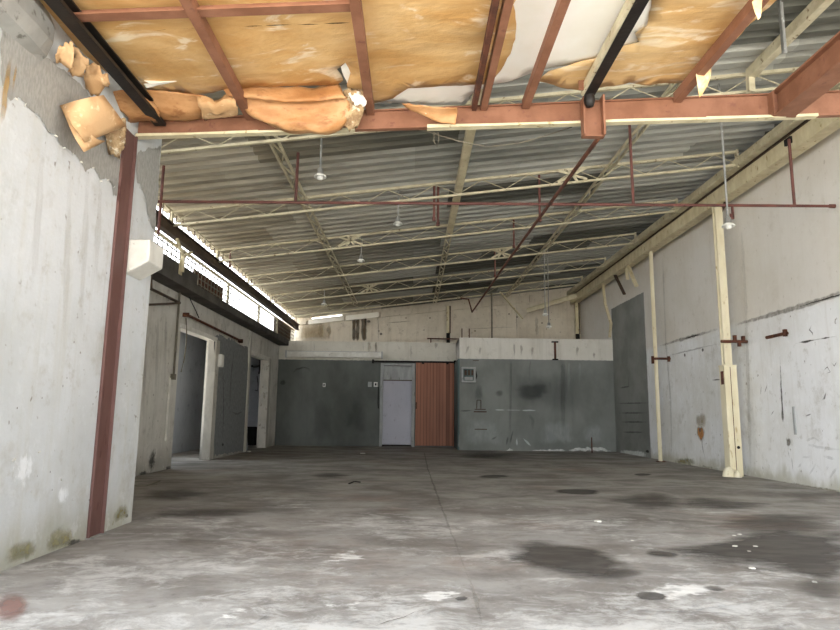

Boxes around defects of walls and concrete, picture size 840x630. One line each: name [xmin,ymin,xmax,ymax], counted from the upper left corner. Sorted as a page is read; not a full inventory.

peeling [0,0,121,196]
peeling [136,146,161,231]
leakage [13,544,32,559]